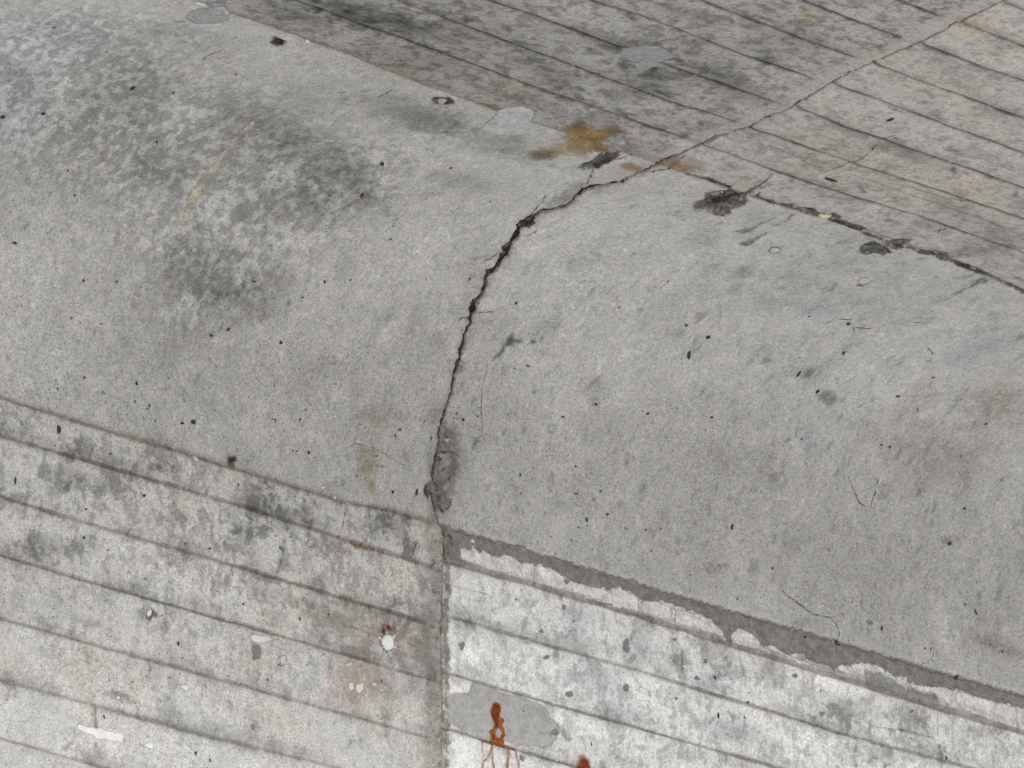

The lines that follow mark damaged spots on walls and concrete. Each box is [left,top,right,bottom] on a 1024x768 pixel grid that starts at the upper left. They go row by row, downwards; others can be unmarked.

rust [533,124,622,159]
spalling [687,173,1024,294]
crack [353,149,688,558]
crack [847,474,879,509]
peeling [443,525,1024,729]
crack [781,590,842,639]
rust [480,702,520,768]
peeling [444,683,569,761]
rust [577,755,590,768]